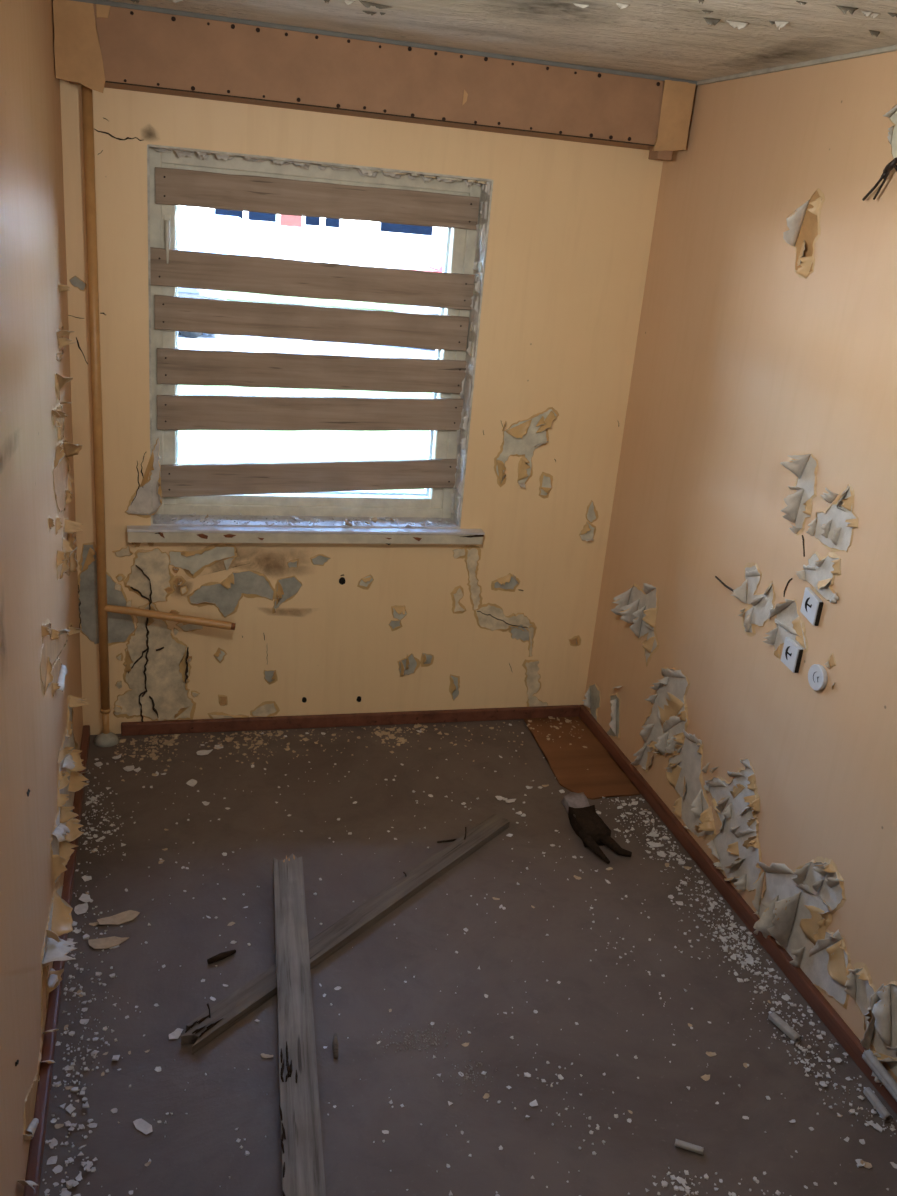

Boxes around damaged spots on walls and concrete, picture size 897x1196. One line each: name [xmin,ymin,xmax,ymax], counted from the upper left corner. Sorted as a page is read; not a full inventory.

spalling [883,105,897,159]
peeling [783,188,825,279]
flaking render [154,147,491,522]
peeling [494,407,559,499]
peeling [732,453,858,659]
peeling [388,605,407,631]
peeling [397,653,434,677]
peeling [449,535,548,707]
spalling [23,322,331,1143]
peeling [582,683,621,741]
peeling [611,583,897,1086]